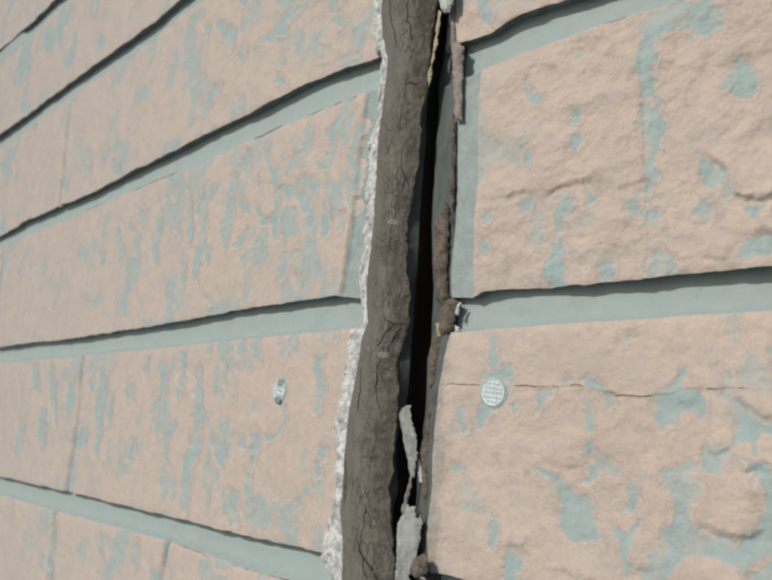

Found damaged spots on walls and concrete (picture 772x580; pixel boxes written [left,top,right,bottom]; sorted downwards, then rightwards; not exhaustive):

crack [389,3,413,44]
peeling [717,45,762,103]
peeling [616,0,733,278]
peeling [320,0,388,580]
spalling [393,3,447,558]
peeling [538,178,602,288]
peeling [594,252,620,283]
peeling [687,148,772,265]
crack [517,384,742,397]
peeling [452,329,772,580]